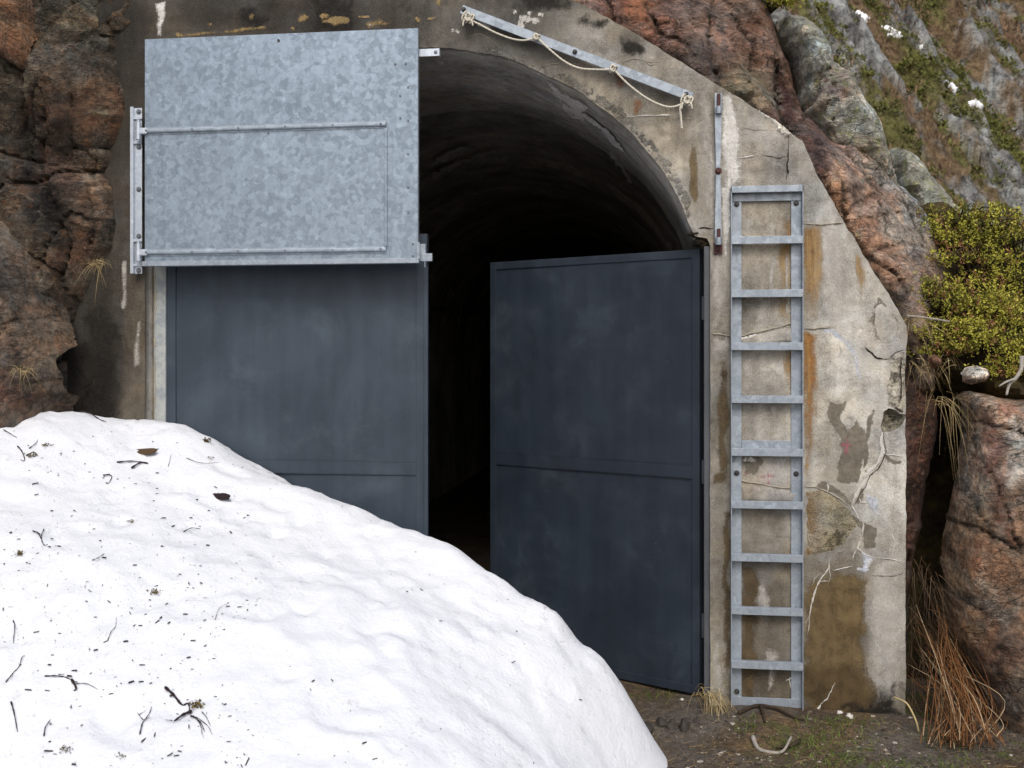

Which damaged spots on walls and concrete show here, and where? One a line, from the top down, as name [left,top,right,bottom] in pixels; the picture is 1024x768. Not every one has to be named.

corrosion [803,228,822,307]
crack [865,346,902,406]
leakage [803,401,903,712]
crack [805,432,903,635]